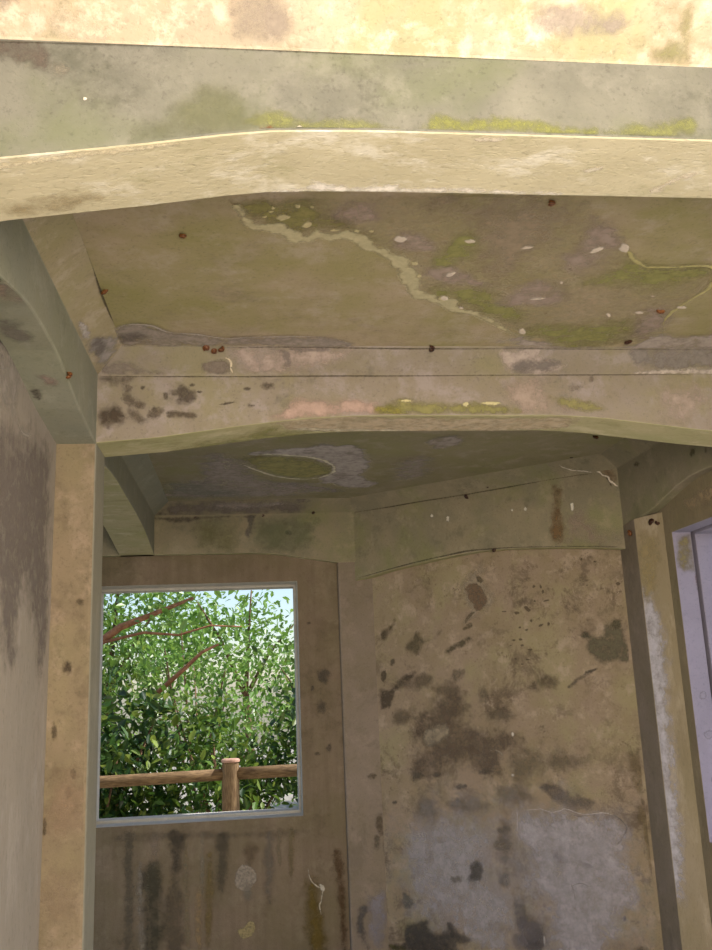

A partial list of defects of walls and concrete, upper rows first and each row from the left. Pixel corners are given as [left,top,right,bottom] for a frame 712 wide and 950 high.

peeling [232,202,712,347]
damp [79,322,351,424]
damp [0,357,49,665]
peeling [243,445,376,488]
damp [568,620,629,688]
damp [401,670,513,779]
damp [125,829,293,950]
damp [390,785,636,950]